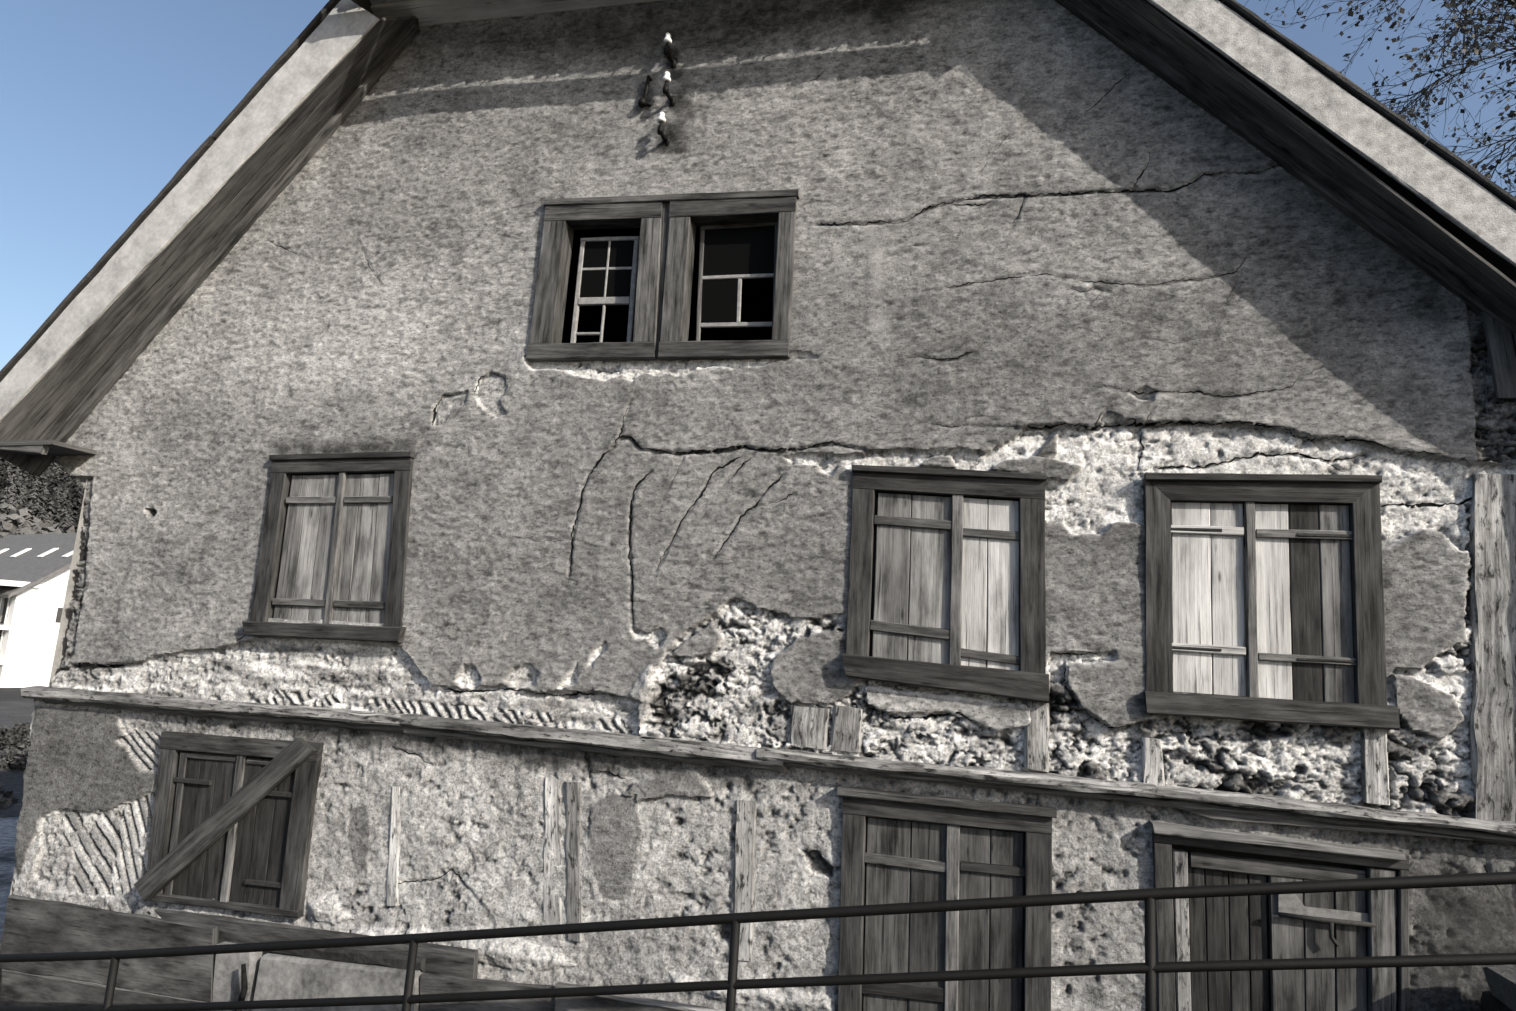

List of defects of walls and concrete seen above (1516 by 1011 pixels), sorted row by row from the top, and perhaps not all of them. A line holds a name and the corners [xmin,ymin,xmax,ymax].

crack [817,139,1274,226]
crack [948,245,1249,307]
crack [417,372,504,452]
crack [515,408,860,628]
flaking render [37,308,1516,818]